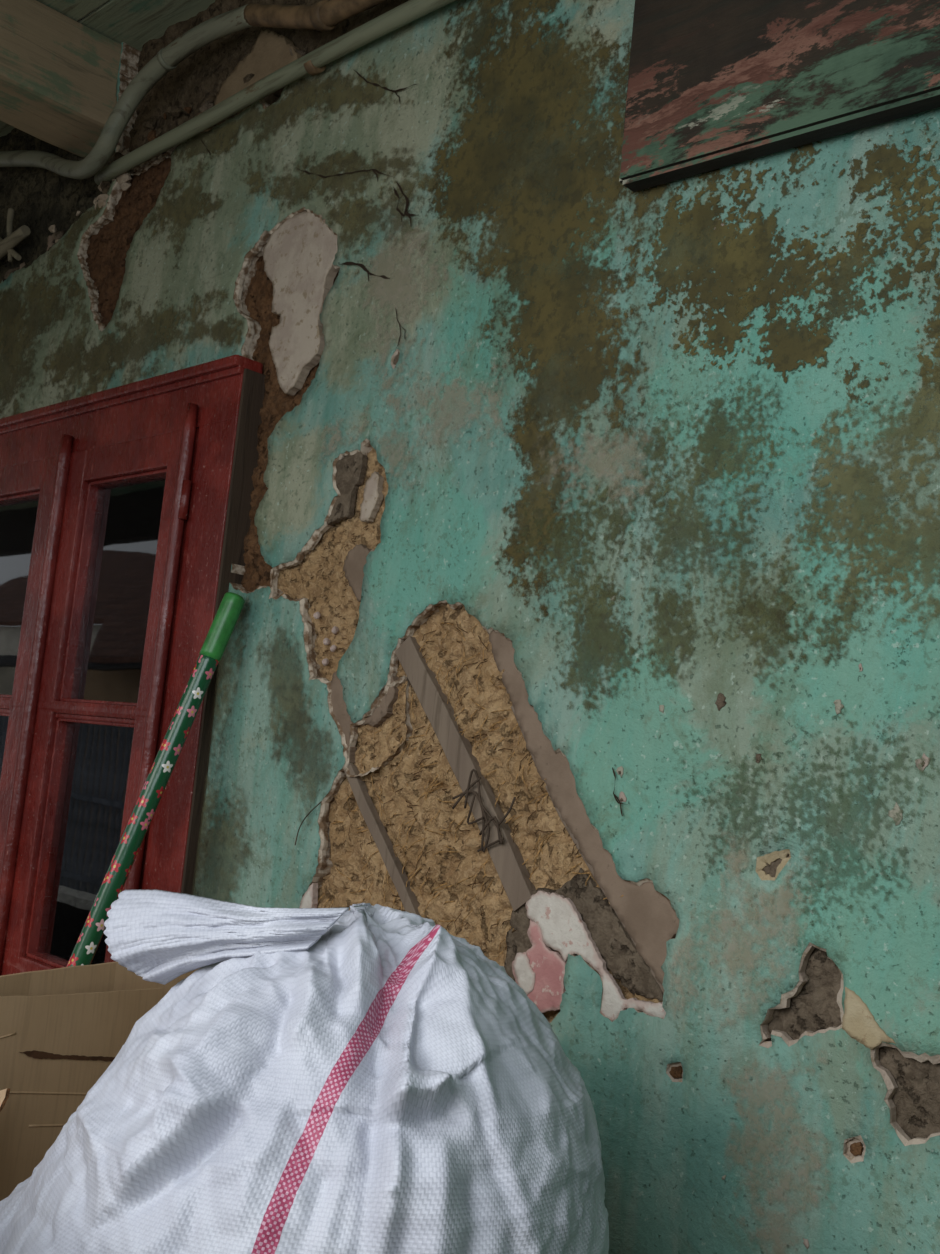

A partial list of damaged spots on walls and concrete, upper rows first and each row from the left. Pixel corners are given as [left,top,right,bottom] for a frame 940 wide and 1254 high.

flaking render [0,0,409,331]
leakage [425,0,940,718]
flaking render [234,207,679,1022]
flaking render [756,849,791,881]
flaking render [666,1062,683,1082]
flaking render [759,943,940,1146]
flaking render [843,1135,866,1163]